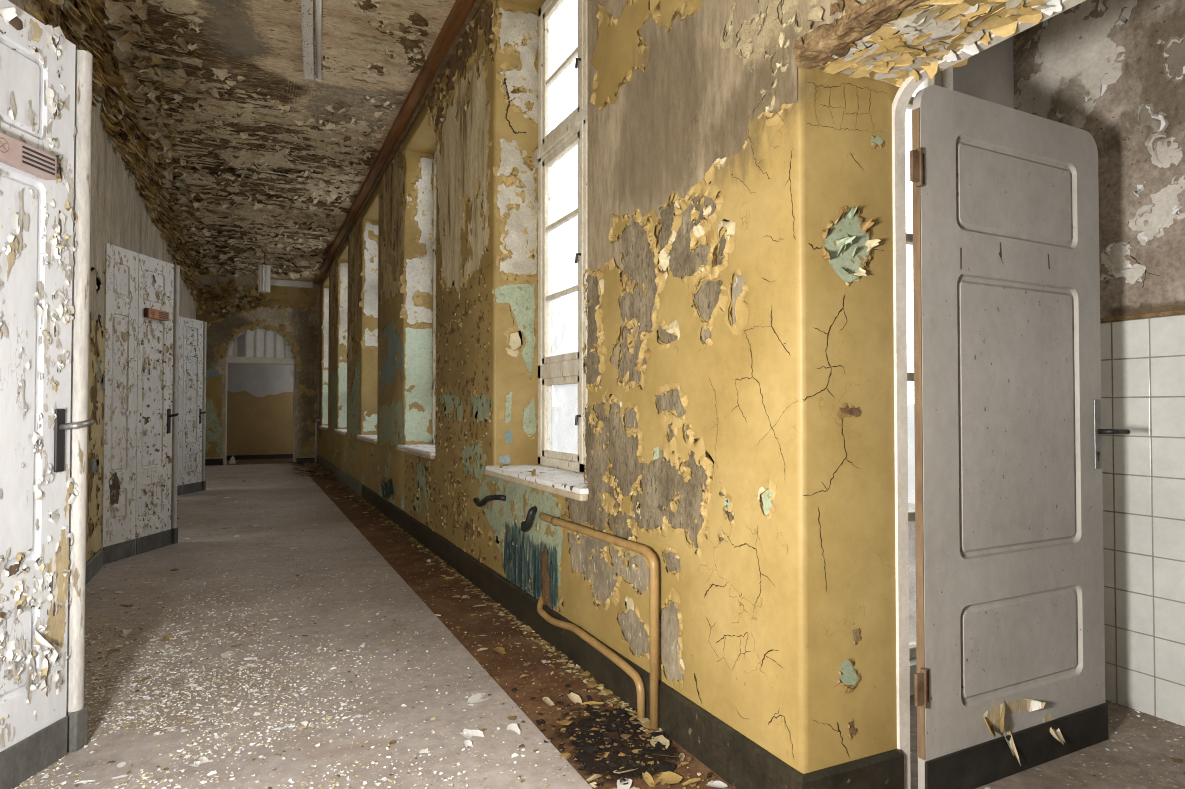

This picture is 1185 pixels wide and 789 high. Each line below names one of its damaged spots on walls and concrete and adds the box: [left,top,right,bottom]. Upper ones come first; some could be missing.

peeling [283,0,449,84]
peeling [1156,33,1185,84]
peeling [1100,103,1185,284]
peeling [0,0,400,542]
peeling [318,0,1137,665]
crack [709,278,861,591]
peeling [0,715,26,749]
peeling [0,379,79,705]
peeling [659,546,685,689]
crack [694,584,783,704]
crack [724,526,773,605]
peeling [835,628,862,694]